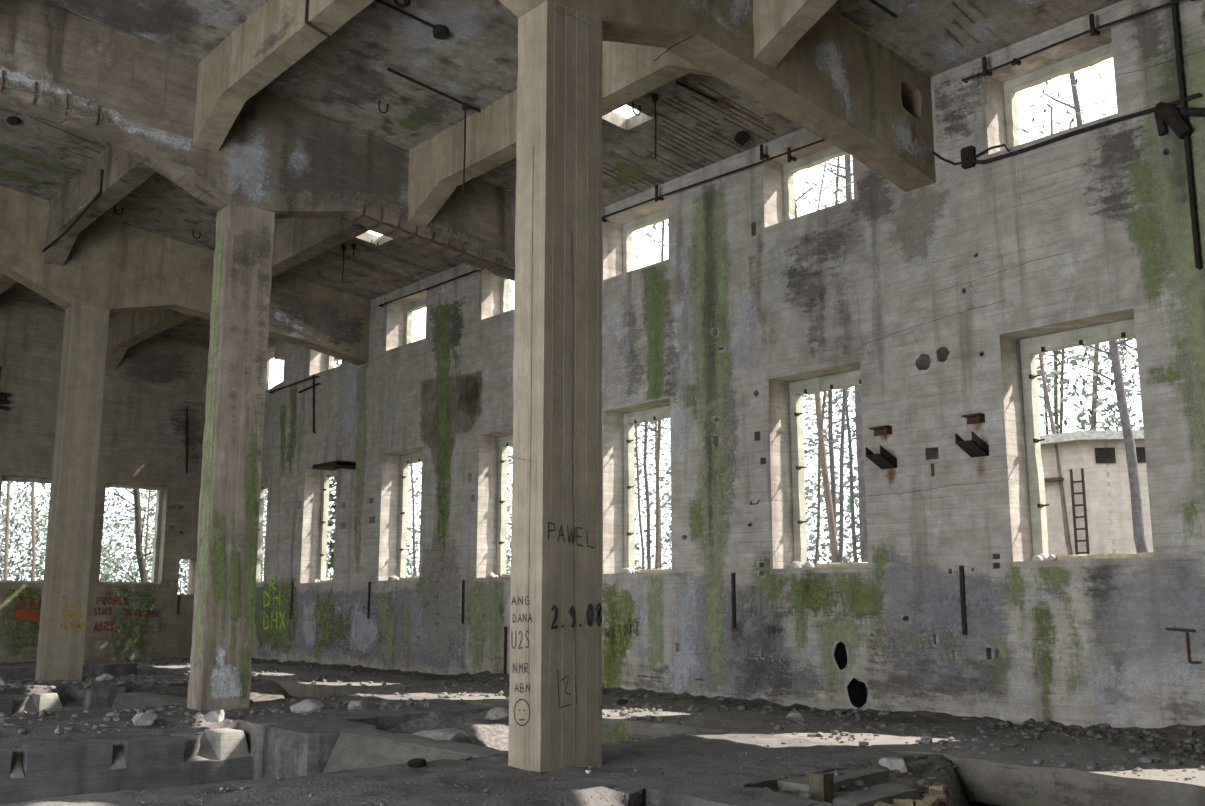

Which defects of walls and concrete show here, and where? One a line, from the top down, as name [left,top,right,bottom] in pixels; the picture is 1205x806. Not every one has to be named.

leakage [934,76,983,134]
leakage [421,303,482,588]
leakage [607,244,759,490]
leakage [868,648,1000,710]